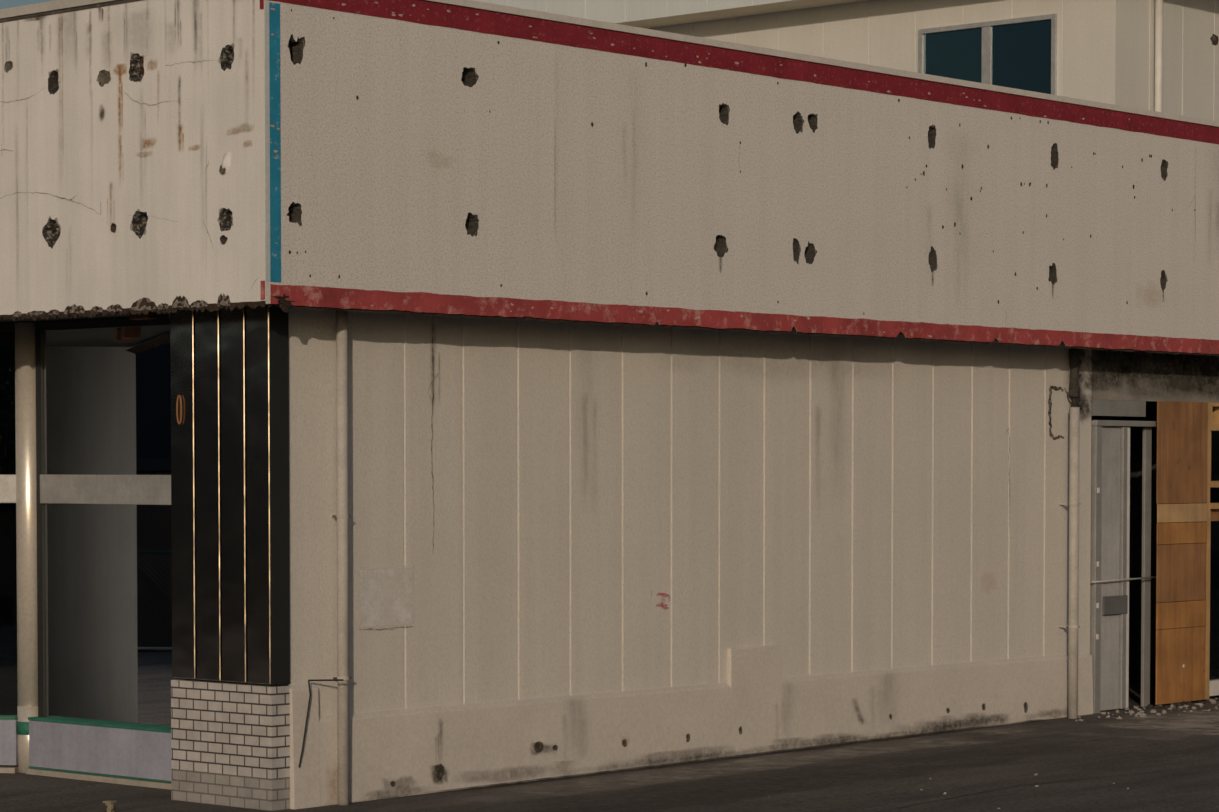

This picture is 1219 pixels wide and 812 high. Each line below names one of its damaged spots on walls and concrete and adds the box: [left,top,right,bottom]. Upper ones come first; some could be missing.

hole [129,52,144,82]
hole [219,43,234,71]
spalling [288,34,305,65]
hole [793,111,818,134]
hole [42,216,61,249]
hole [111,209,148,239]
hole [217,208,233,245]
spalling [929,246,937,281]
spalling [1036,263,1057,293]
spalling [1160,270,1168,297]
spalling [0,293,1219,357]